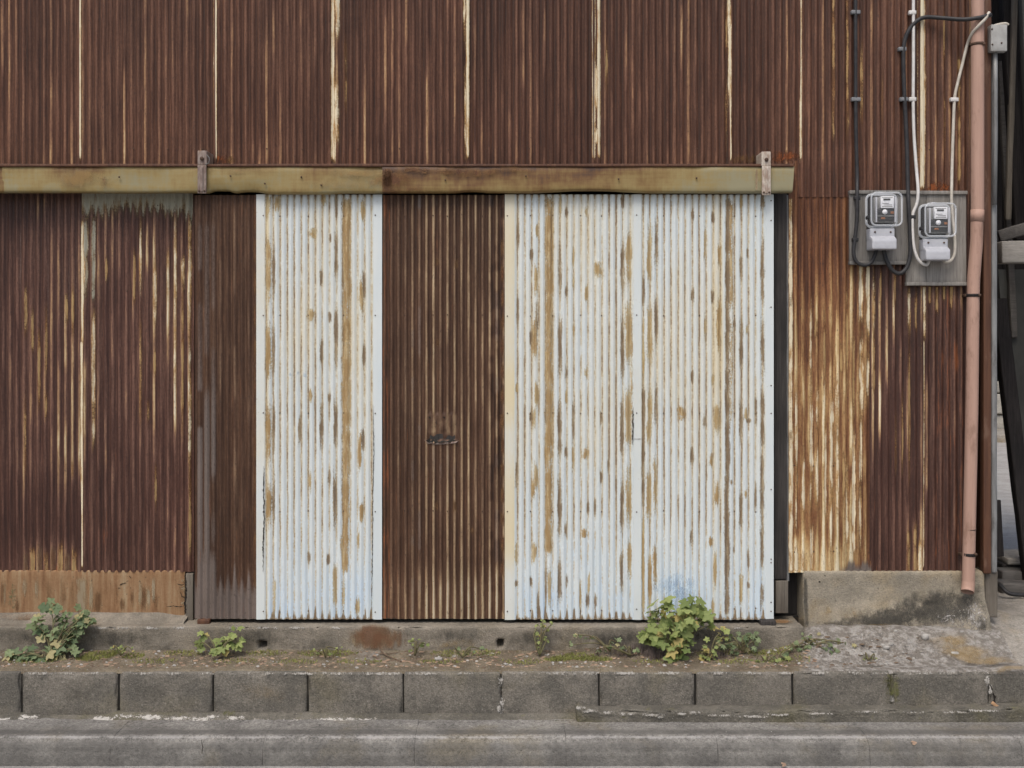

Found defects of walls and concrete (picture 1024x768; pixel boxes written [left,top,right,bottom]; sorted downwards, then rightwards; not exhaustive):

corrosion [254,195,280,228]
corrosion [254,239,275,305]
corrosion [501,267,519,327]
corrosion [254,308,275,394]
corrosion [500,341,518,402]
corrosion [254,401,275,461]
corrosion [269,183,401,649]
corrosion [515,195,672,620]
corrosion [703,194,789,623]
corrosion [254,471,275,558]
corrosion [24,545,77,571]
water stain [825,593,984,625]